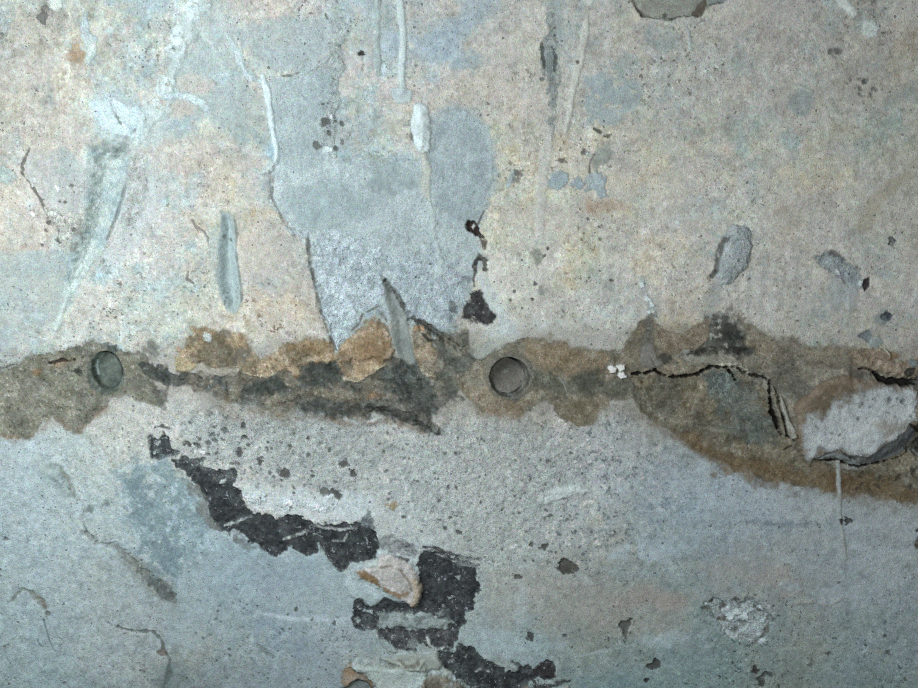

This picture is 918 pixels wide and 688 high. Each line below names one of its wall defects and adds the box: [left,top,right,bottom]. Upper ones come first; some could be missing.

spalling [253,55,498,353]
spalling [506,170,523,188]
spalling [530,247,549,265]
damp [0,278,918,504]
crack [631,362,918,467]
flaking render [793,330,918,466]
spalling [176,409,594,586]
damp [148,424,570,688]
flaking render [355,554,422,607]
spalling [341,663,467,688]
spalling [644,658,660,682]